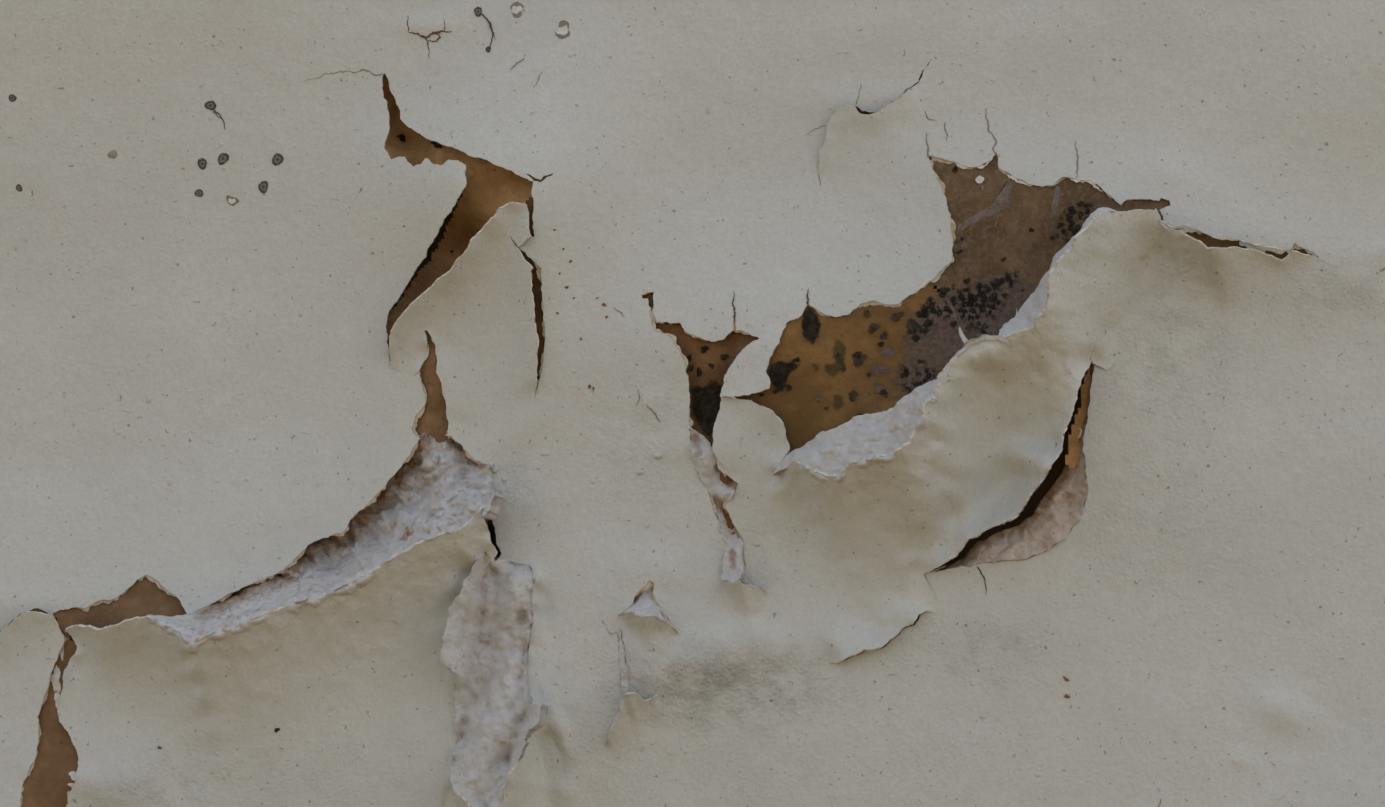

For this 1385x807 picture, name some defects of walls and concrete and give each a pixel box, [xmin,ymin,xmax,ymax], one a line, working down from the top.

water stain [953,183,1012,254]
water stain [1050,187,1094,243]
water stain [759,257,1033,399]
peeling [0,74,590,807]
water stain [815,390,863,415]
peeling [641,153,1328,664]
peeling [618,580,685,676]